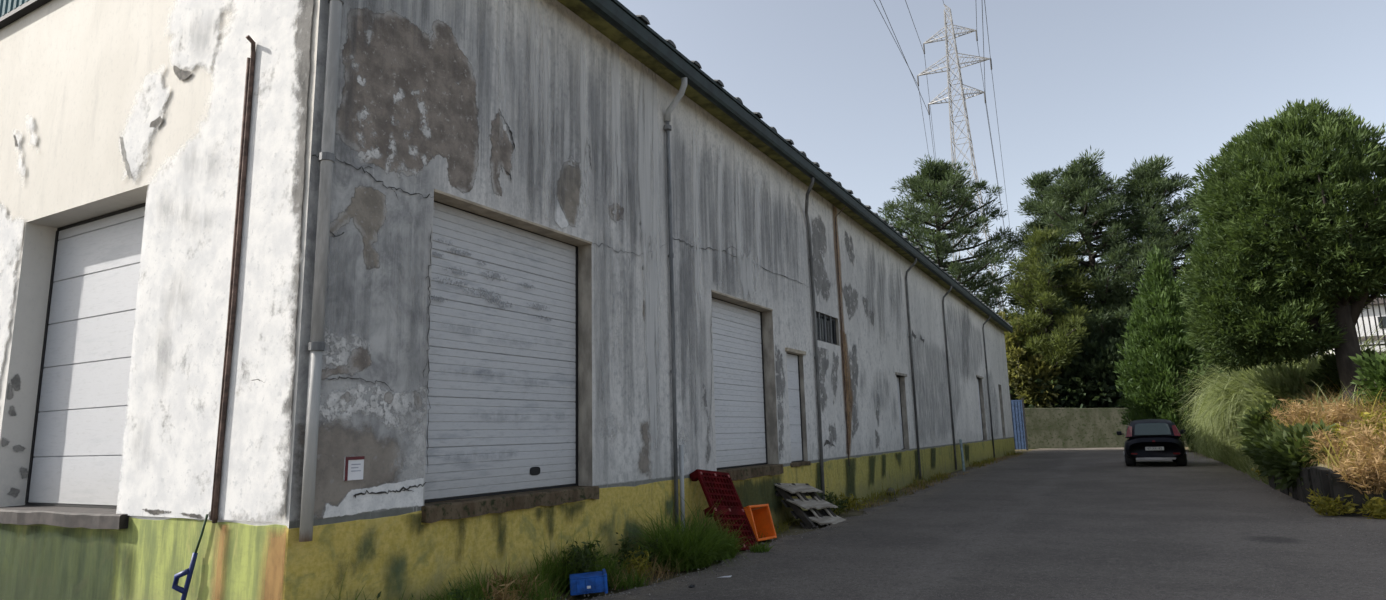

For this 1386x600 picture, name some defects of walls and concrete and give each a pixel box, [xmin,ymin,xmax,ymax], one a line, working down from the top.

peeling [0,205,24,416]
peeling [116,0,426,522]
crack [312,154,432,498]
flaking render [335,8,513,196]
flaking render [554,156,588,229]
water stain [580,47,588,181]
water stain [612,44,620,200]
water stain [638,64,659,451]
water stain [693,136,701,306]
water stain [717,158,759,300]
flaking render [818,345,859,446]
flaking render [812,218,874,324]